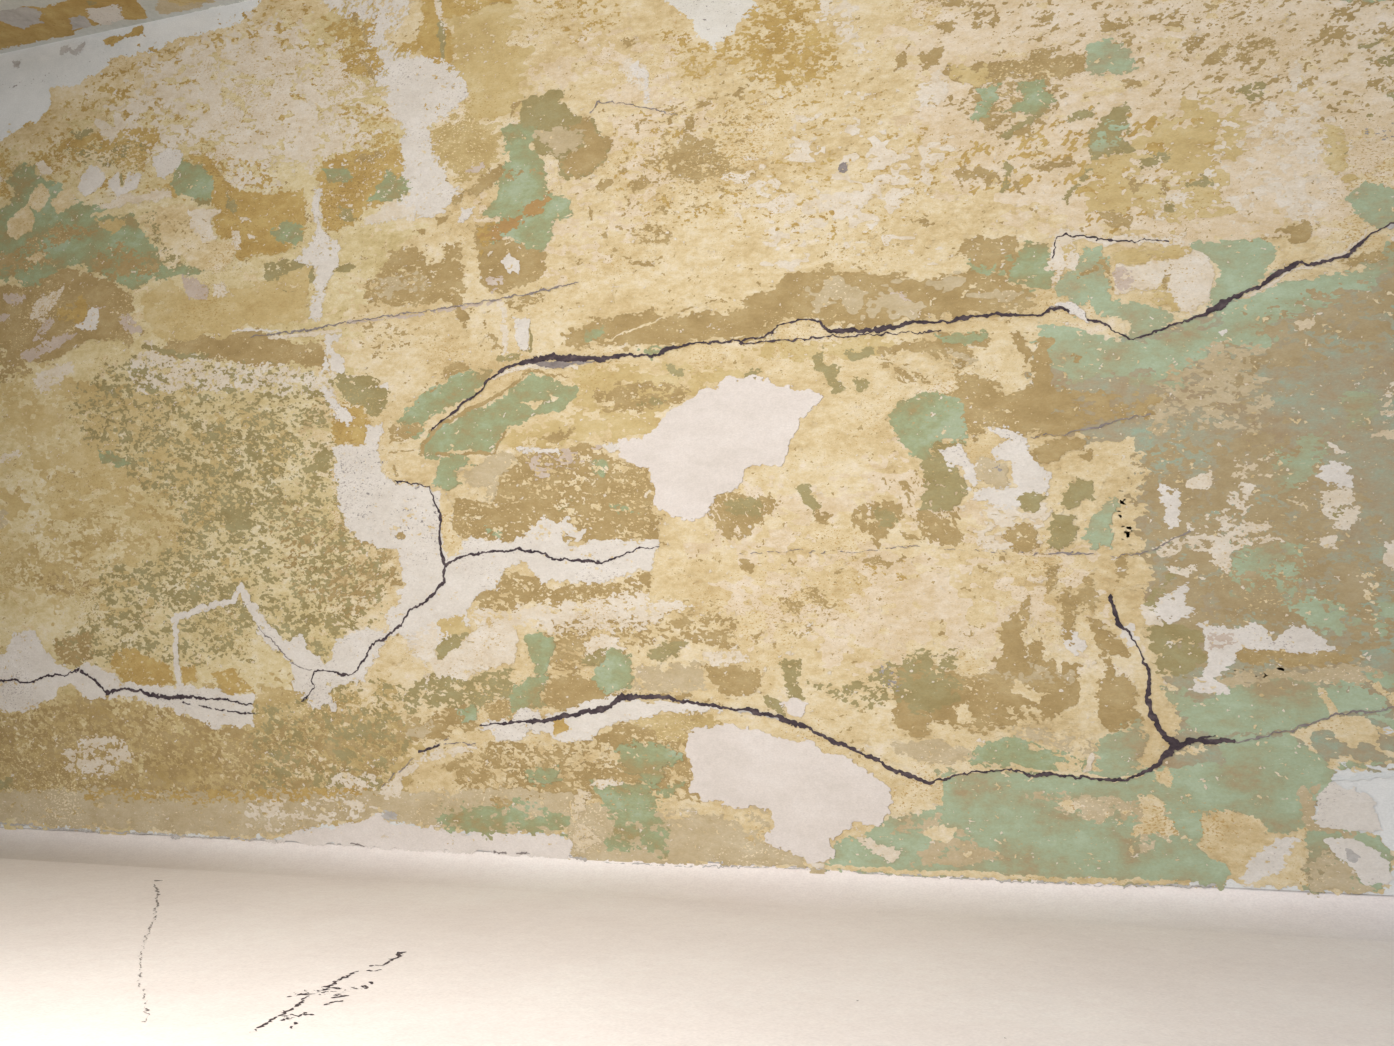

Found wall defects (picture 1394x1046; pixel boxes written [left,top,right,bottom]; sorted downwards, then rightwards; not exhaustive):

crack [590,60,677,115]
crack [431,222,1394,431]
peeling [0,0,1394,836]
crack [1030,413,1151,438]
crack [258,480,660,702]
crack [740,530,1191,558]
crack [382,594,1394,787]
peeling [753,804,926,874]
peeling [923,824,957,843]
peeling [1104,790,1242,889]